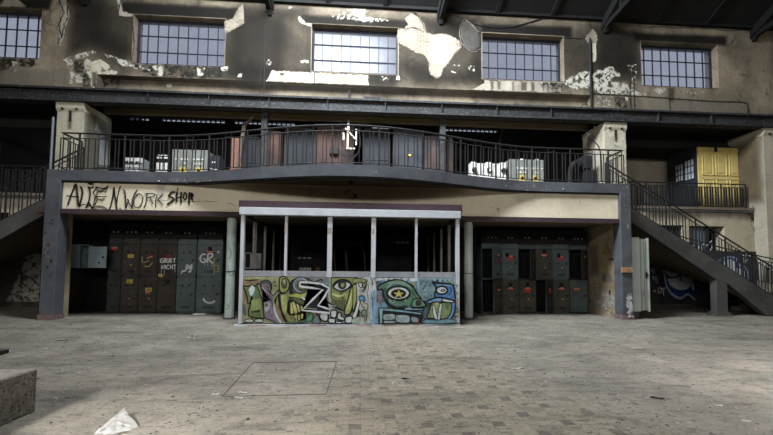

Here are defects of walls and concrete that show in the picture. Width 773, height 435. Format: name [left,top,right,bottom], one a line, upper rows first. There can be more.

spalling [224,4,244,33]
spalling [333,8,388,22]
spalling [397,12,462,79]
peeling [63,50,150,88]
spalling [266,60,369,85]
spalling [473,29,666,108]